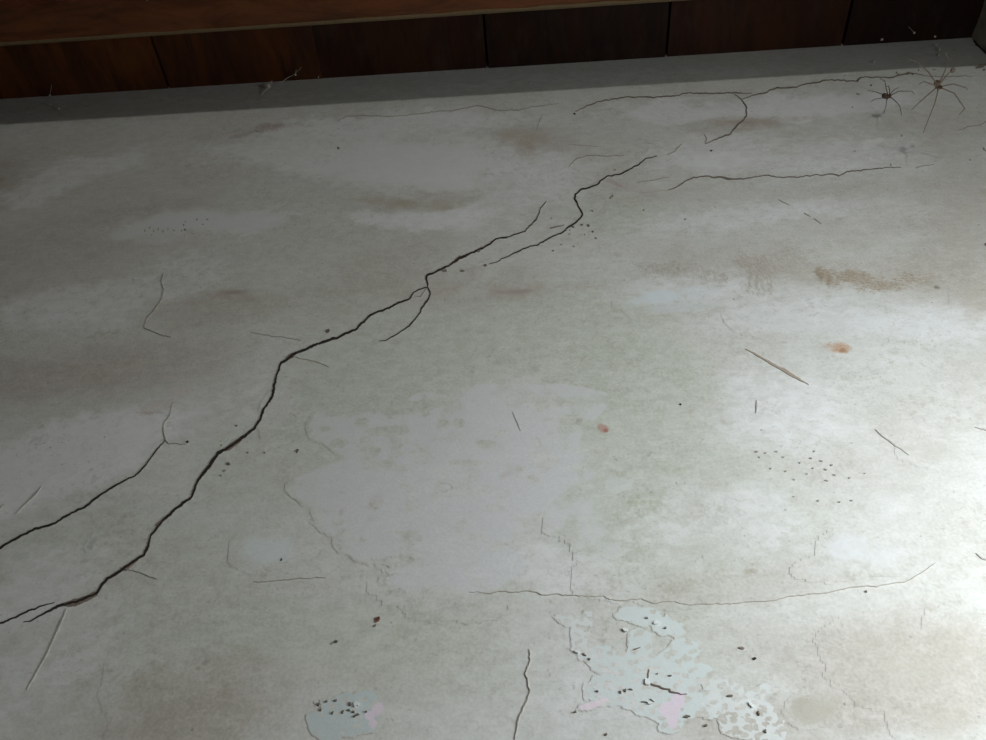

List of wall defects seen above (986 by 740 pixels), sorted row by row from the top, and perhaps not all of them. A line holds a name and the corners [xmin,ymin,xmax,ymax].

crack [0,72,972,624]
peeling [305,689,385,740]
crack [515,649,530,735]
crack [641,672,684,703]
peeling [553,605,789,740]